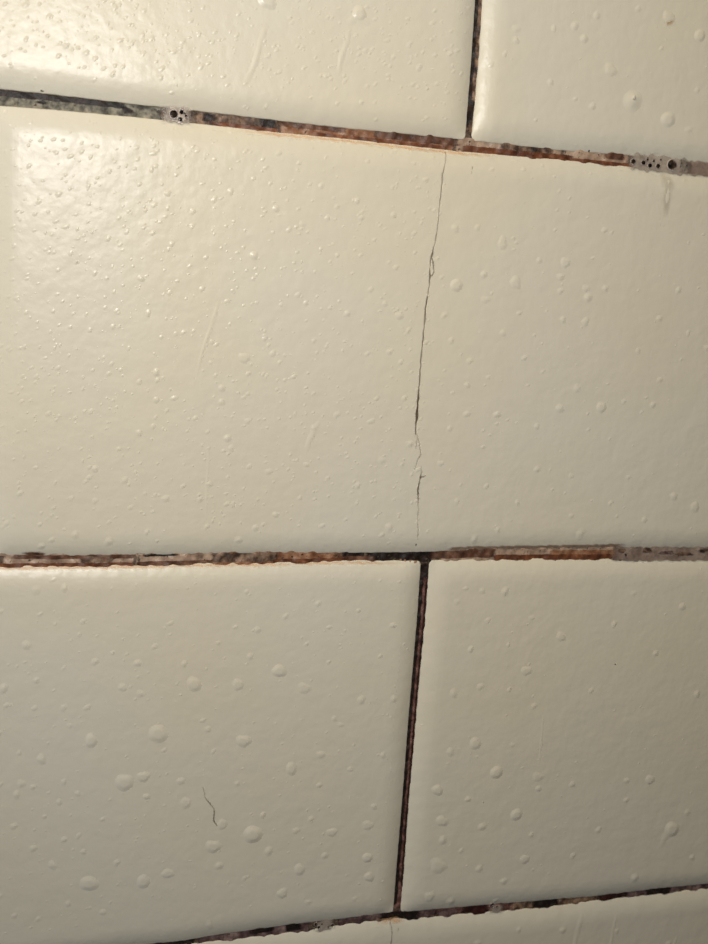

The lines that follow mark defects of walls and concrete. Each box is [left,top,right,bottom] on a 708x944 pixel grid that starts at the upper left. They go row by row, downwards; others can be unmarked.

crack [415,251,434,434]